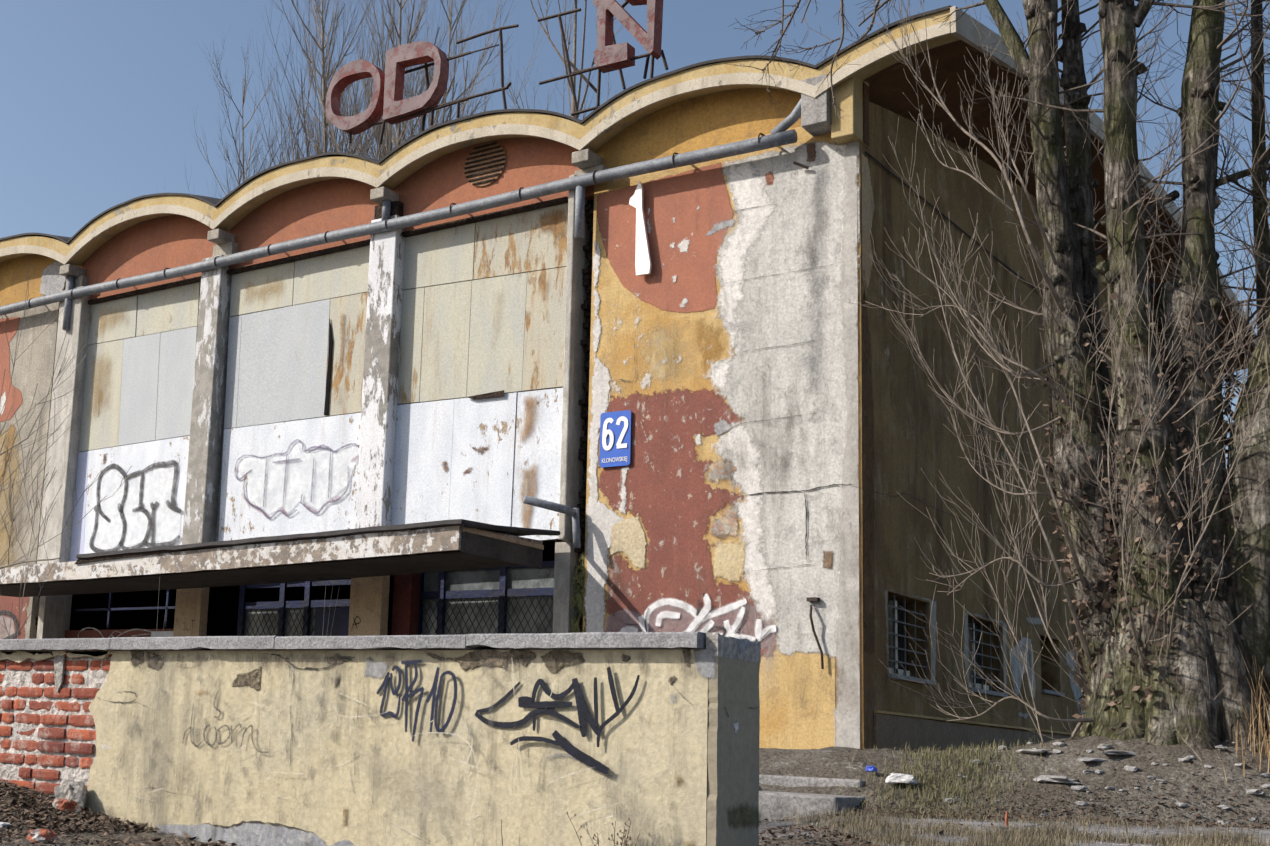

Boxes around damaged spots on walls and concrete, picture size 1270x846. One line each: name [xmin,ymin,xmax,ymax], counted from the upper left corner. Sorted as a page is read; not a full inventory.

corrosion [540,210,565,236]
spalling [670,239,690,253]
peeling [695,141,875,657]
peeling [584,242,647,632]
peeling [75,548,193,564]
flaking render [427,648,585,674]
peeling [683,648,715,678]
flaking render [232,666,262,691]
flaking render [0,650,163,797]
flaking render [155,822,355,846]